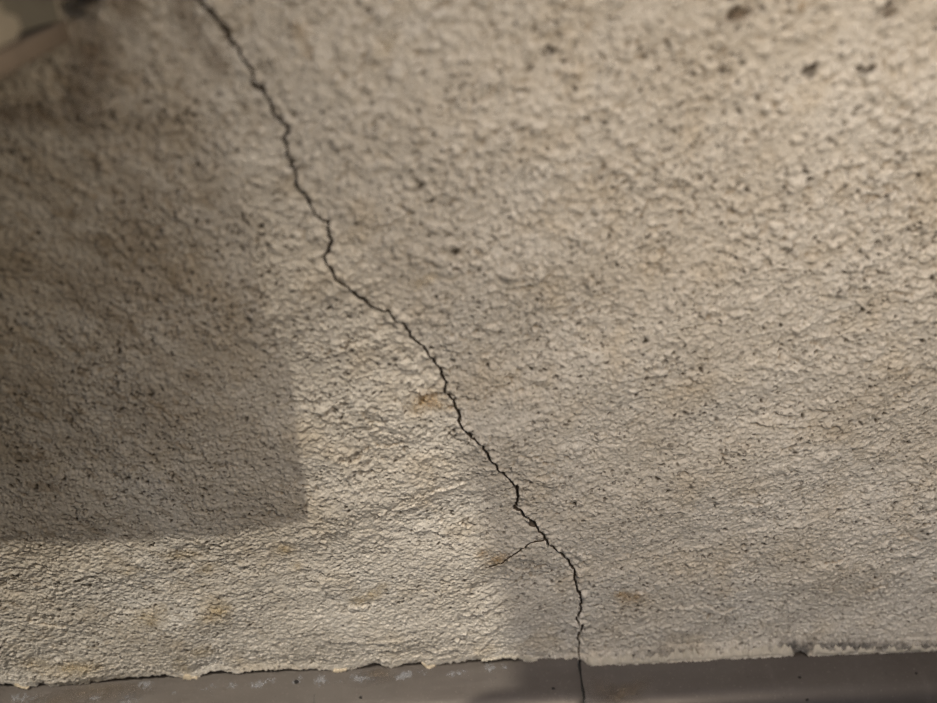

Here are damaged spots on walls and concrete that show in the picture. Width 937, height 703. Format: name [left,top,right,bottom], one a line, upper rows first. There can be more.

crack [194,0,590,703]